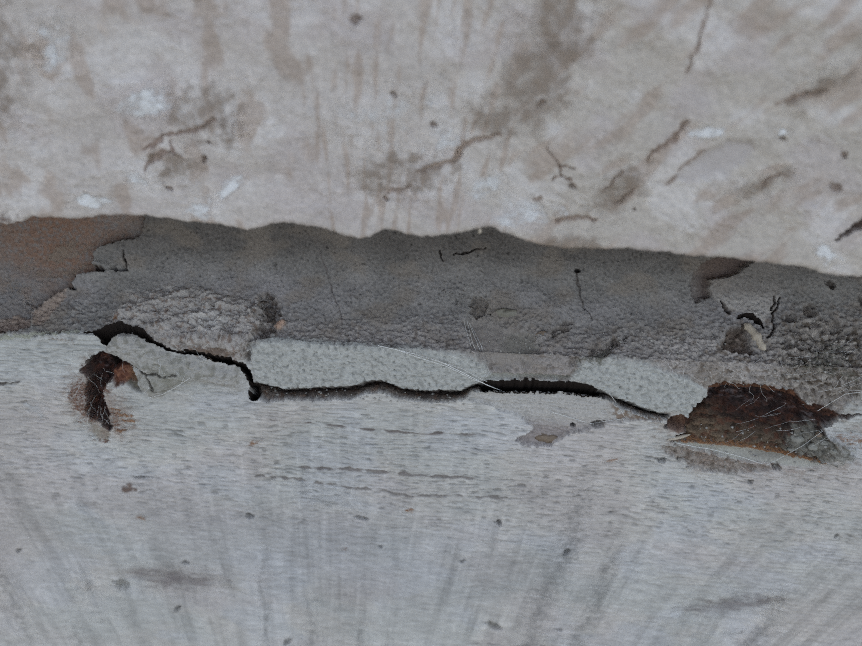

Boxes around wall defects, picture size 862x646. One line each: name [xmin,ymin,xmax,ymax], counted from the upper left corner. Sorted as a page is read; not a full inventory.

rust [68,351,142,443]
crack [84,321,670,422]
spalling [463,295,542,373]
spalling [469,304,862,485]
peeling [690,257,781,324]
rust [681,435,825,464]